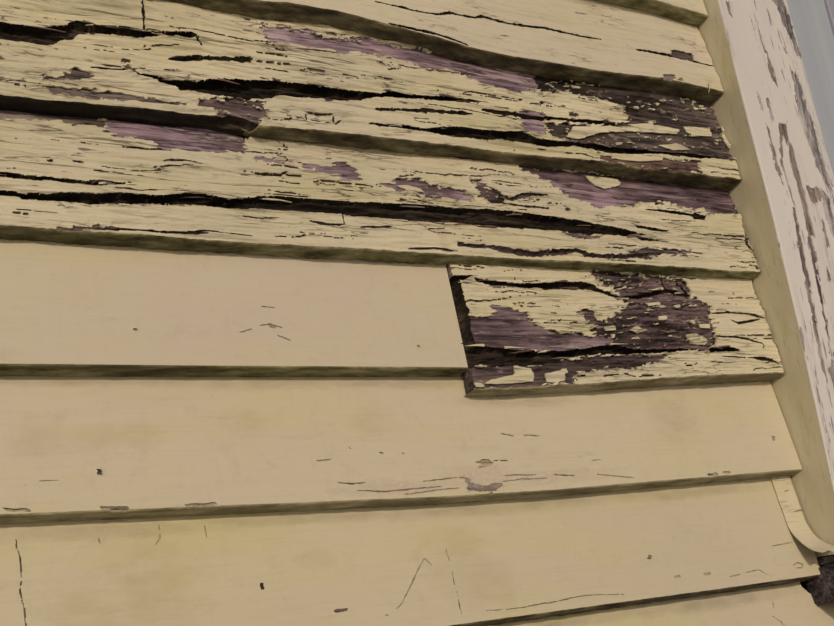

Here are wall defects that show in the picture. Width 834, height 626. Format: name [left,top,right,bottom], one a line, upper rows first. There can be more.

peeling [772,0,801,57]
peeling [42,68,186,106]
peeling [0,110,247,153]
peeling [198,98,267,125]
peeling [253,154,363,181]
crack [0,0,738,175]
crack [0,139,756,324]
peeling [261,23,733,174]
peeling [380,165,738,214]
peeling [757,72,834,386]
peeling [469,270,715,388]
crack [15,539,27,626]